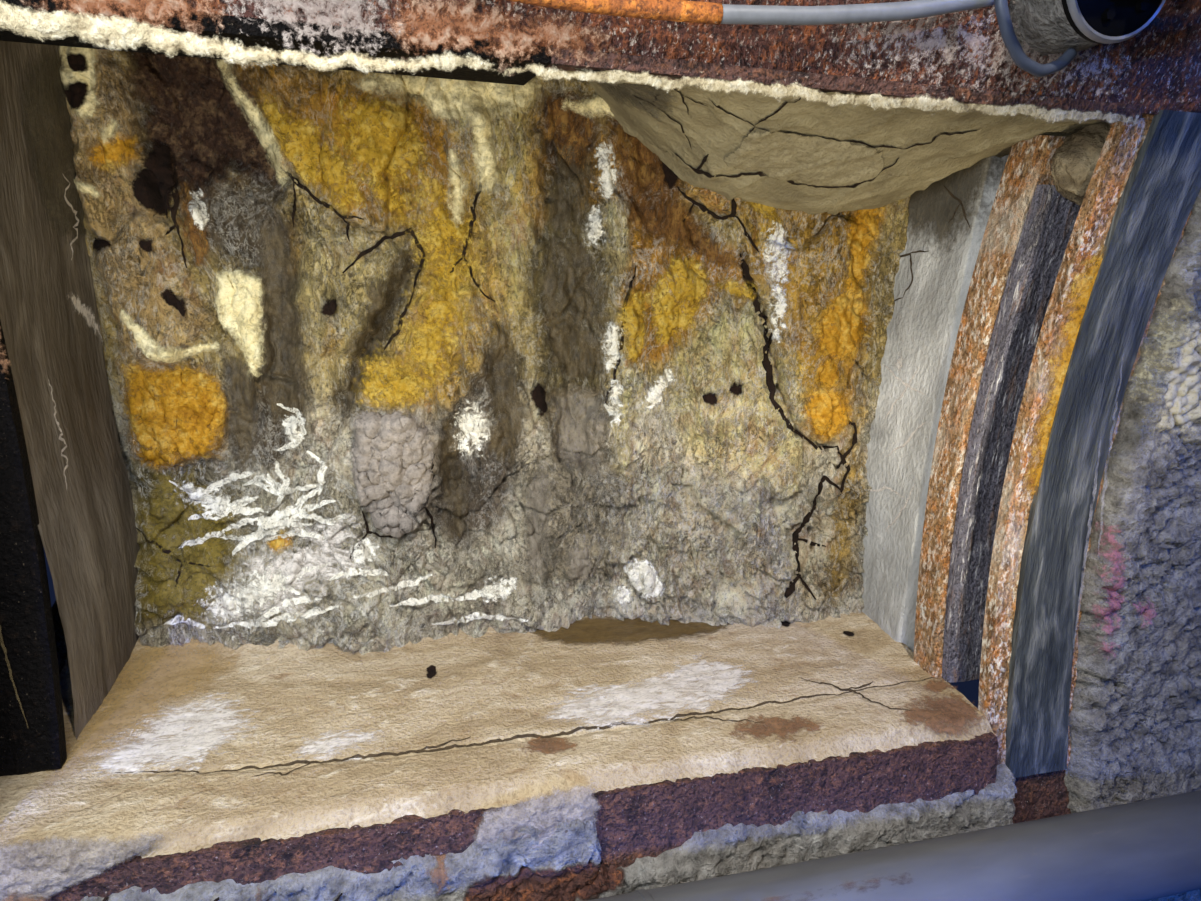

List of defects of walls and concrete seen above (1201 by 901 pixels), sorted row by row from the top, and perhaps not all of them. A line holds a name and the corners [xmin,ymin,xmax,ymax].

rust [42,0,223,30]
rust [390,0,614,65]
crack [165,143,187,268]
crack [276,162,495,350]
water stain [48,379,68,488]
crack [633,89,982,600]
rust [1026,255,1104,494]
water stain [66,227,757,775]
crack [115,676,952,776]
rust [899,678,985,735]